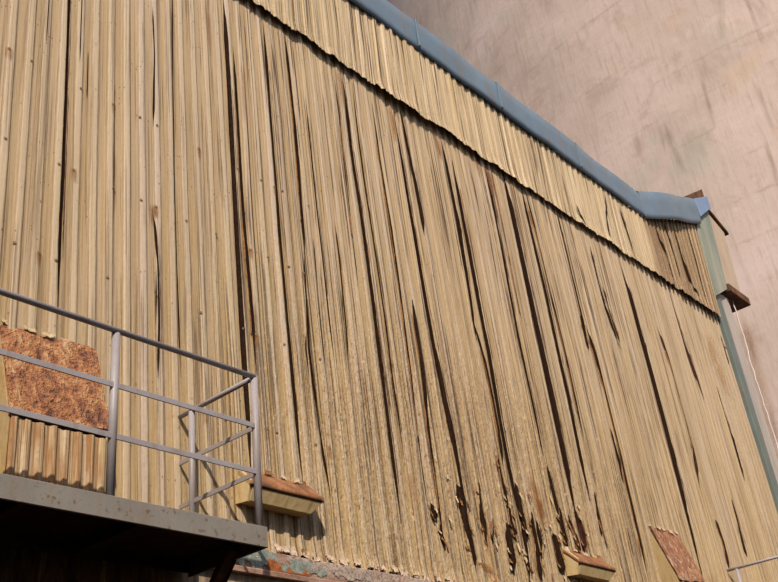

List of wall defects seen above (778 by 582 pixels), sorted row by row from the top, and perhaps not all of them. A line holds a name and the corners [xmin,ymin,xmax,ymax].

peeling [236,543,478,582]
peeling [470,512,602,582]